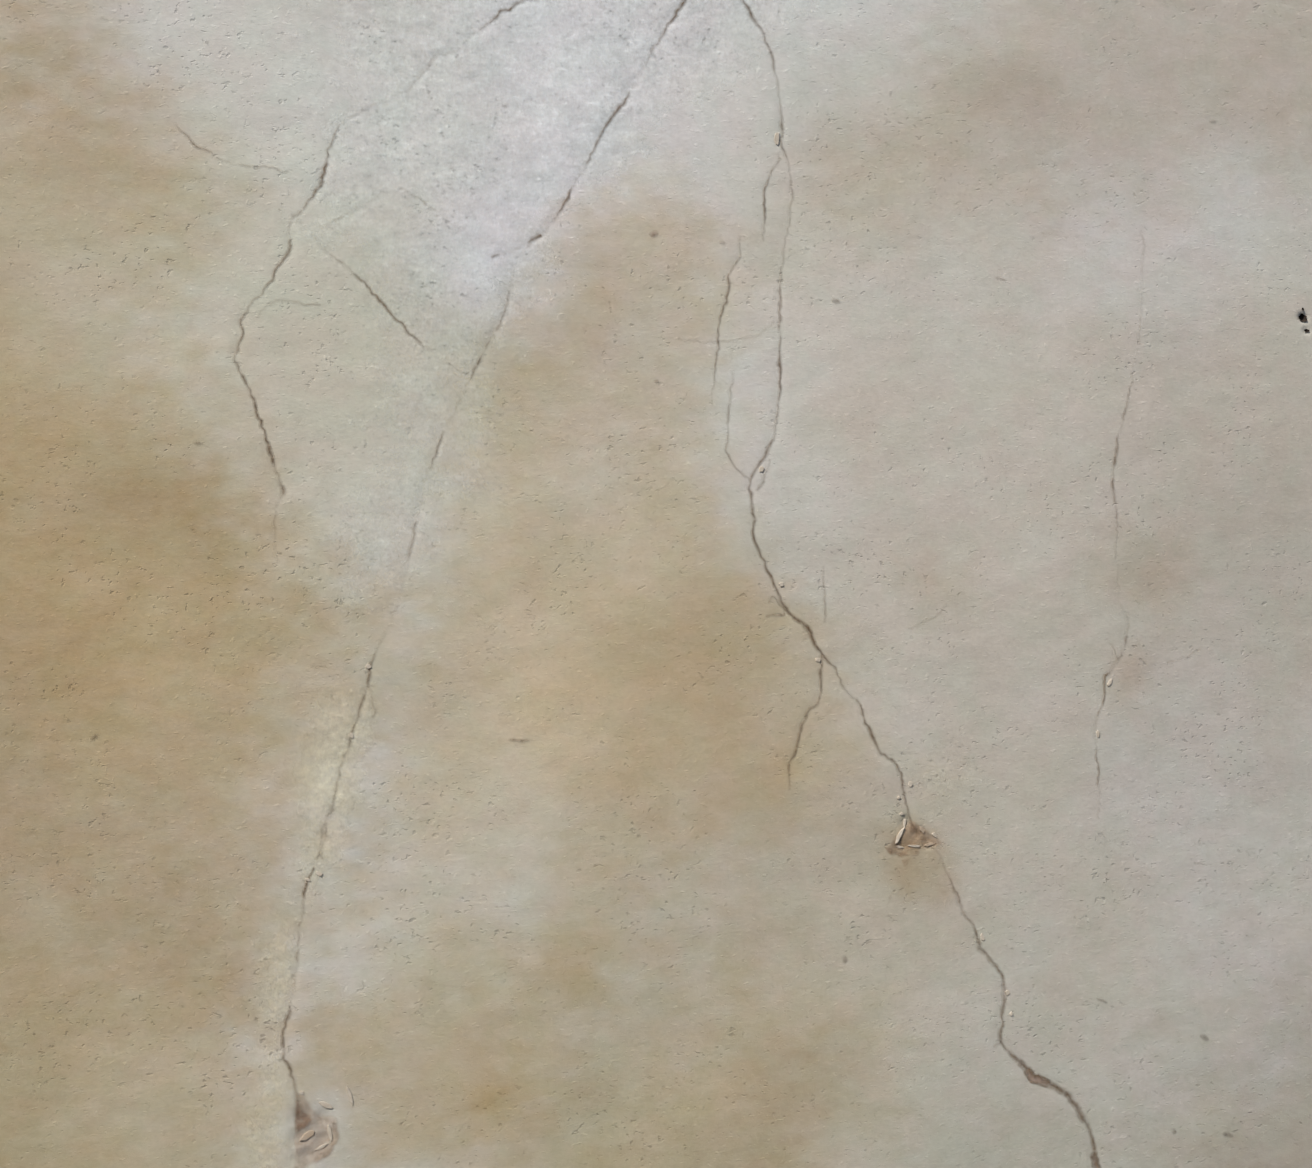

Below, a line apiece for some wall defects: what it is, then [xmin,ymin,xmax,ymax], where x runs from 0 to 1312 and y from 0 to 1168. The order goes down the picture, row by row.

crack [362,280,407,331]
crack [242,375,283,489]
crack [752,513,826,674]
crack [1096,673,1112,775]
spalling [895,782,937,848]
crack [976,933,1099,1168]